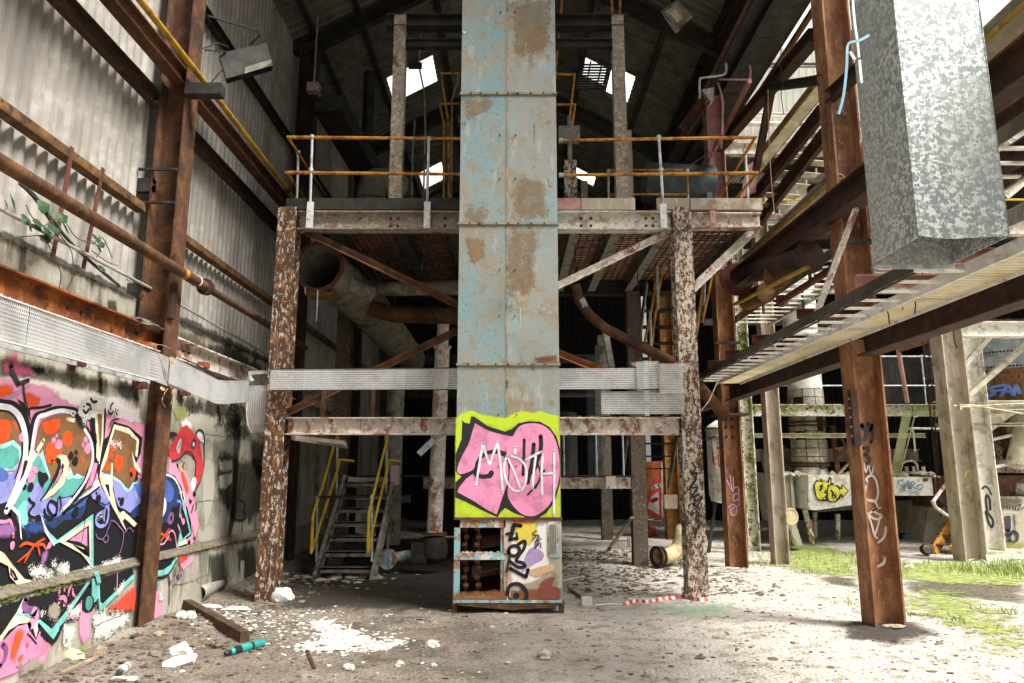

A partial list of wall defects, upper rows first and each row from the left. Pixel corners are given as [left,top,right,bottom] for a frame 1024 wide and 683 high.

peeling [508,0,551,65]
peeling [507,178,549,313]
leakage [179,396,264,543]
corrosion [454,589,561,600]